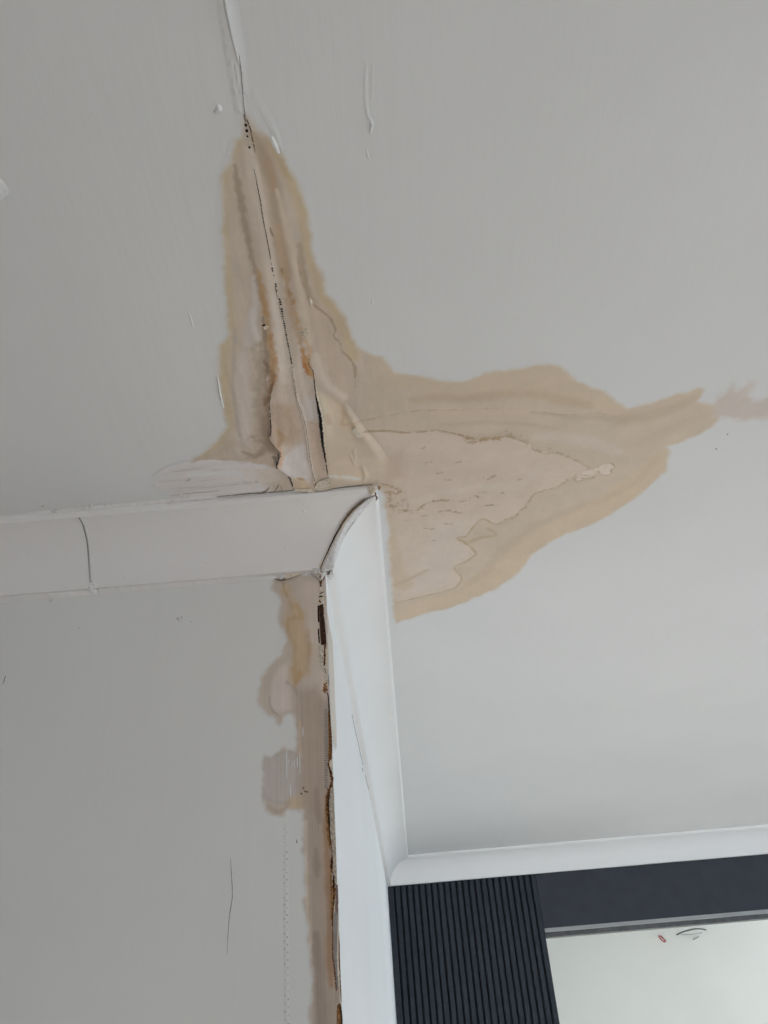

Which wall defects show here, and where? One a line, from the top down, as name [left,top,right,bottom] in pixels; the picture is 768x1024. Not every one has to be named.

crack [217,0,283,259]
crack [172,398,294,497]
leakage [187,110,768,625]
leakage [255,573,342,1024]
spalling [318,584,343,1024]